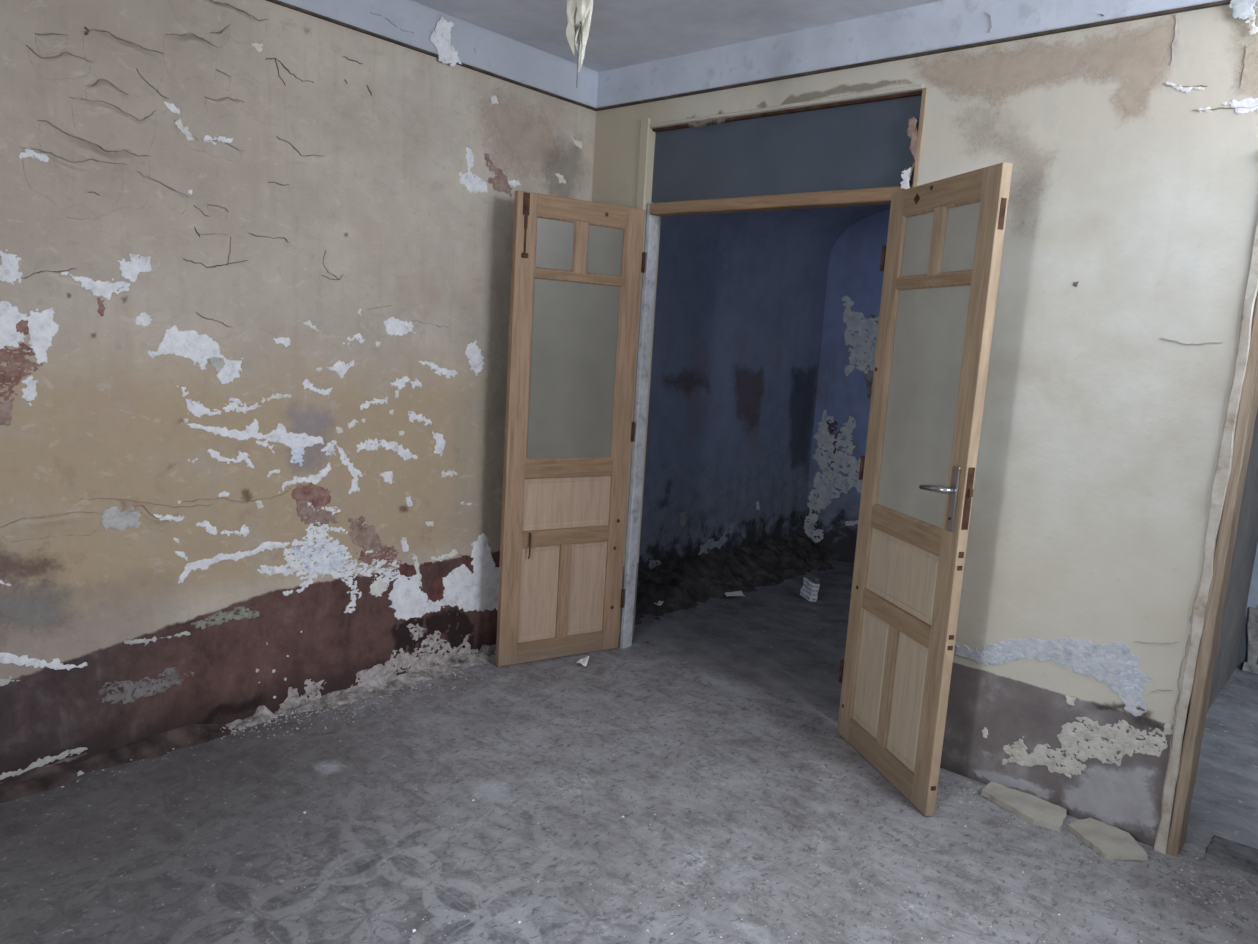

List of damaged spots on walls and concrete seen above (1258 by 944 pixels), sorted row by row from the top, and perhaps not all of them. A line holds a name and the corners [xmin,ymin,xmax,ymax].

crack [266,58,314,84]
leakage [919,22,1174,114]
crack [1163,16,1258,114]
leakage [1239,8,1258,91]
peeling [0,249,152,300]
crack [184,226,288,268]
spalling [0,301,59,426]
peeling [145,325,244,384]
spalling [177,340,499,621]
leakage [257,532,400,613]
leakage [390,609,479,664]
peeling [954,637,1172,779]